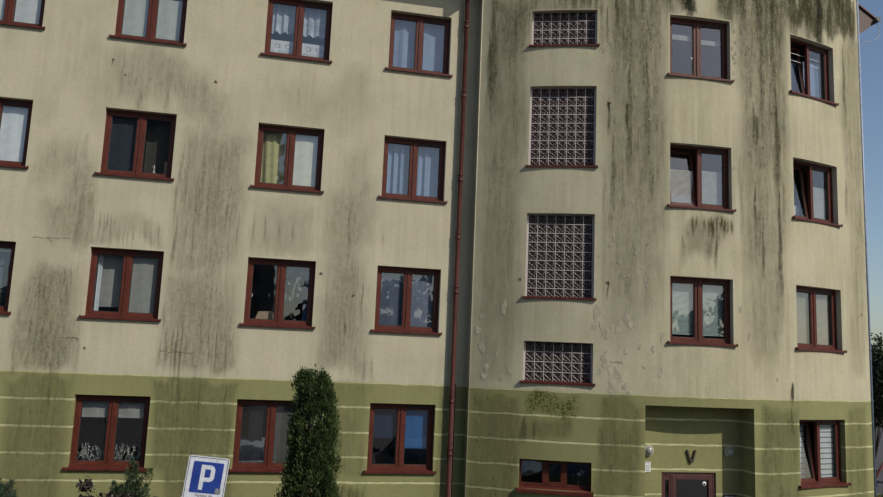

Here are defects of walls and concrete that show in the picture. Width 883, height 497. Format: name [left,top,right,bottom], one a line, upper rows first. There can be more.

damp [719,0,855,80]
damp [750,89,780,180]